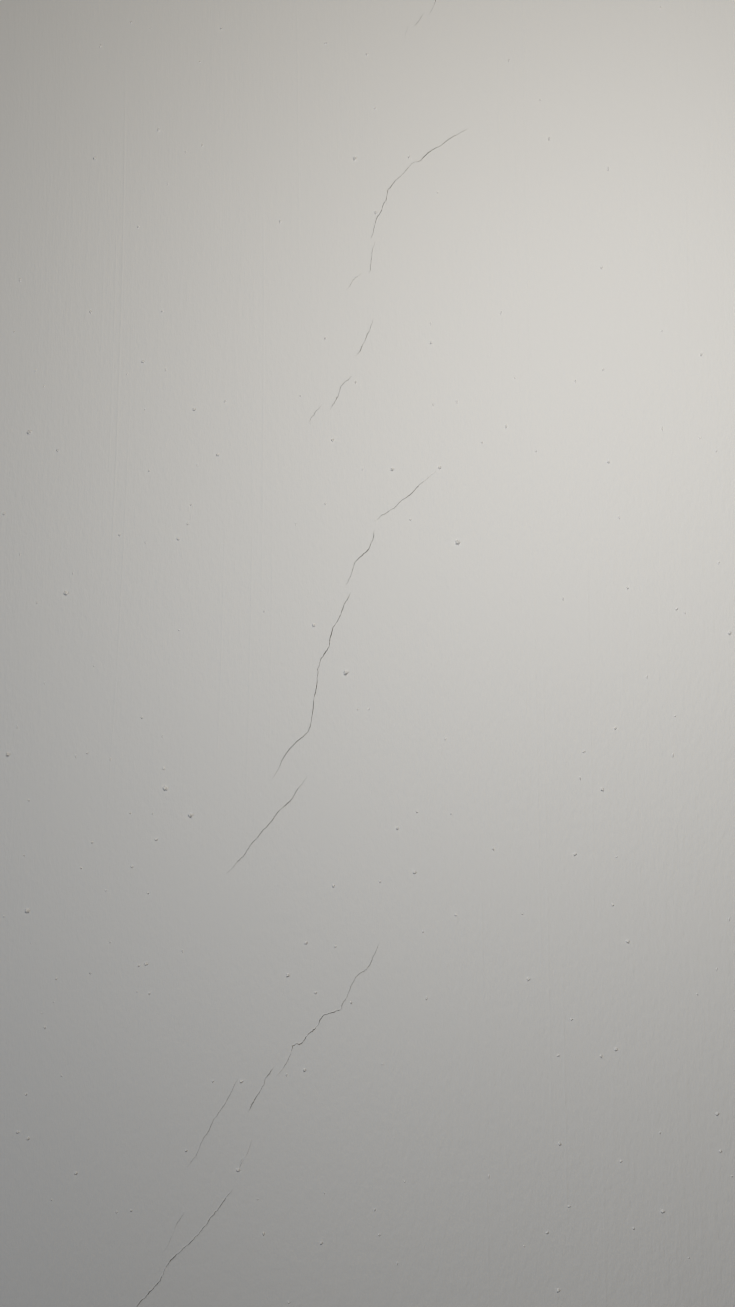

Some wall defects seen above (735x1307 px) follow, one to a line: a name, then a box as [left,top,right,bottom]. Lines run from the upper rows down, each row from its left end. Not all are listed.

crack [308,318,374,425]
crack [346,128,469,290]
crack [226,470,437,874]
crack [135,941,380,1307]